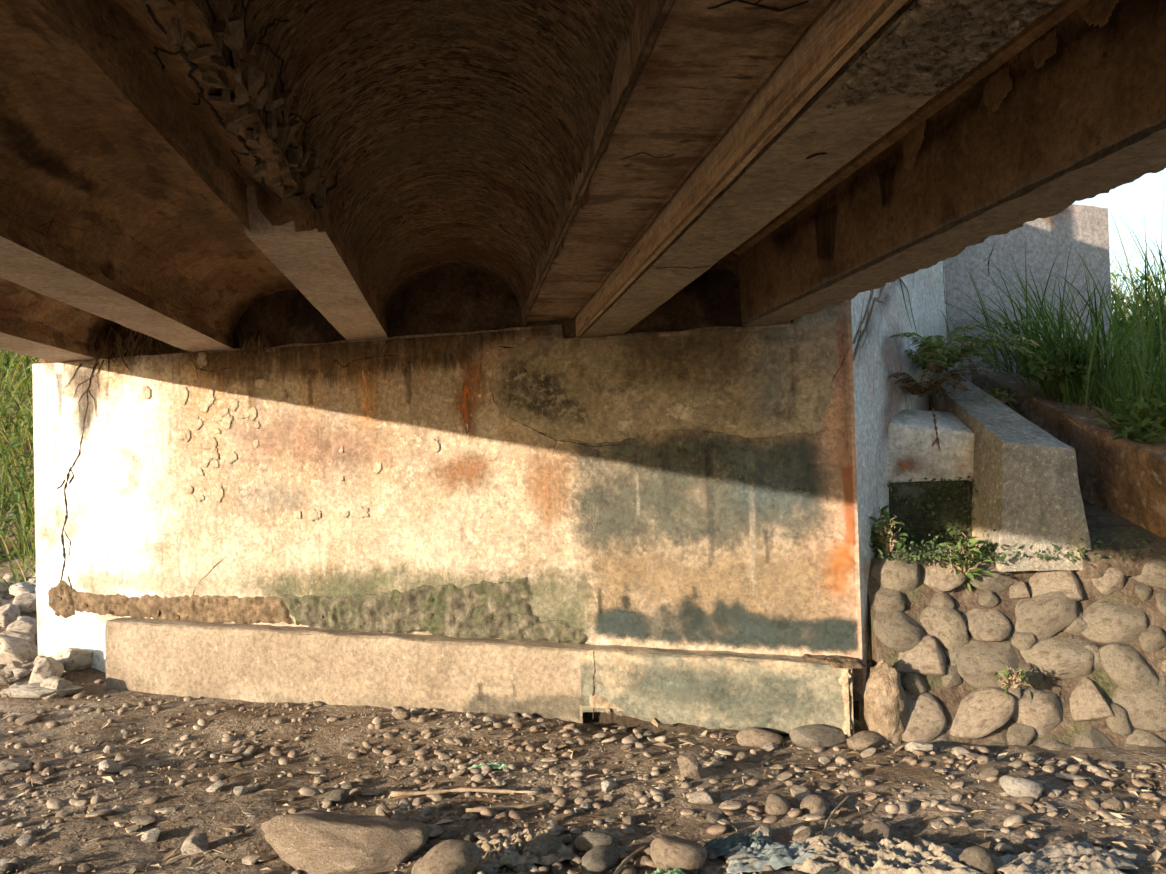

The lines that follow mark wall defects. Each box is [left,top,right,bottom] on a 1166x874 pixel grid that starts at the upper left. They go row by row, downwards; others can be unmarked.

crack [141,0,342,213]
crack [708,0,809,12]
spalling [824,0,1063,113]
rust [457,366,481,433]
damp [503,362,585,420]
crack [56,433,83,589]
damp [575,403,870,654]
rust [835,467,854,574]
crack [592,650,601,719]